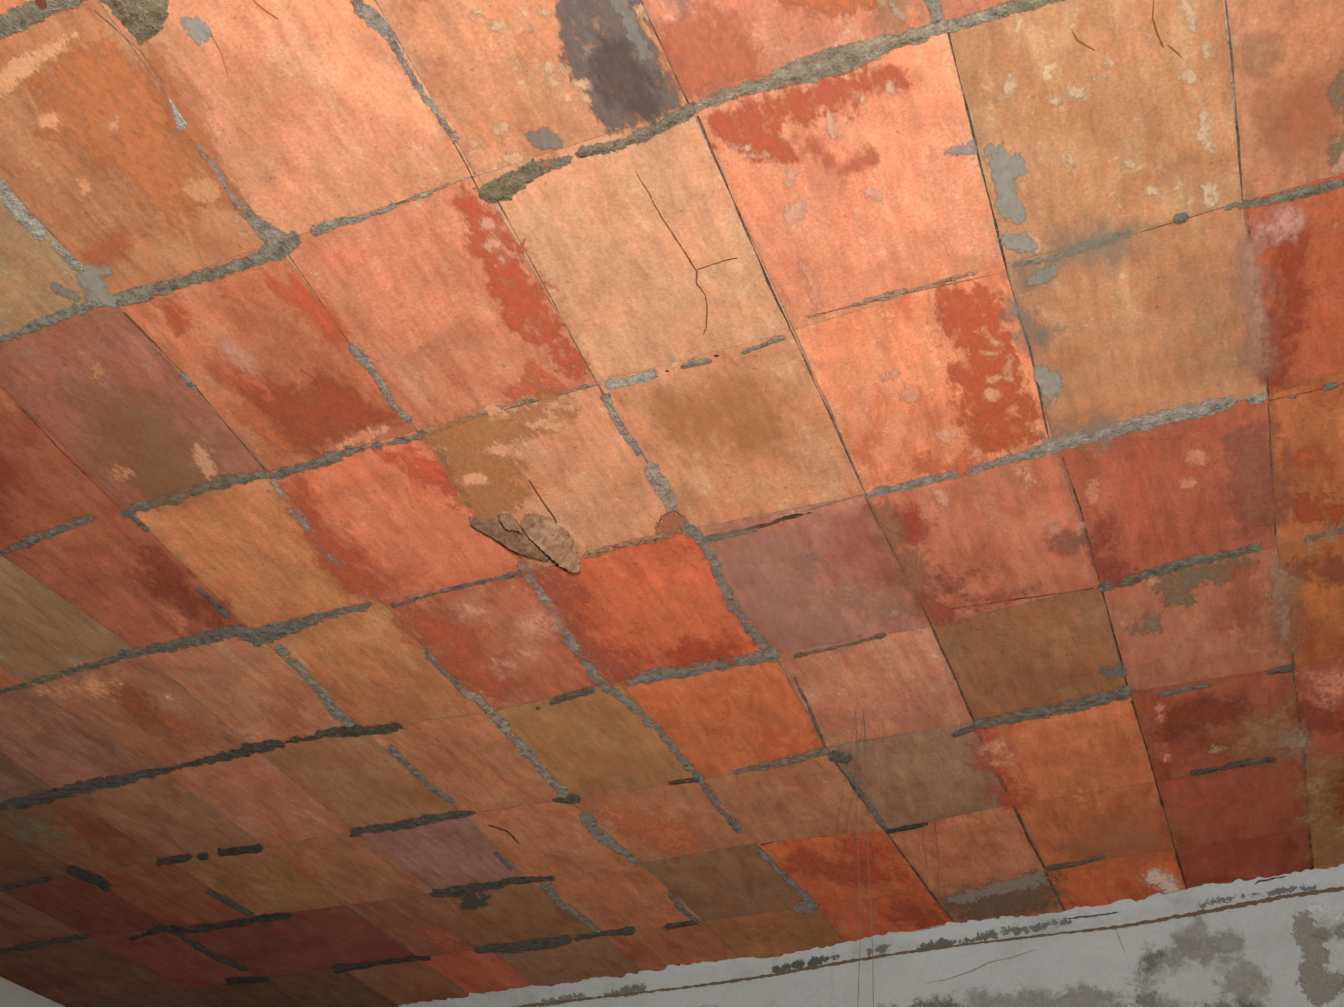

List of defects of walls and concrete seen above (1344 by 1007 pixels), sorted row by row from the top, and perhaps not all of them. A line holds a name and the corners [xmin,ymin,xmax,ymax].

water stain [780,0,908,23]
water stain [529,0,760,135]
water stain [526,127,563,150]
water stain [709,65,912,224]
crack [636,172,736,335]
water stain [886,870,1064,929]
water stain [912,984,1115,1007]
water stain [1136,917,1267,1007]